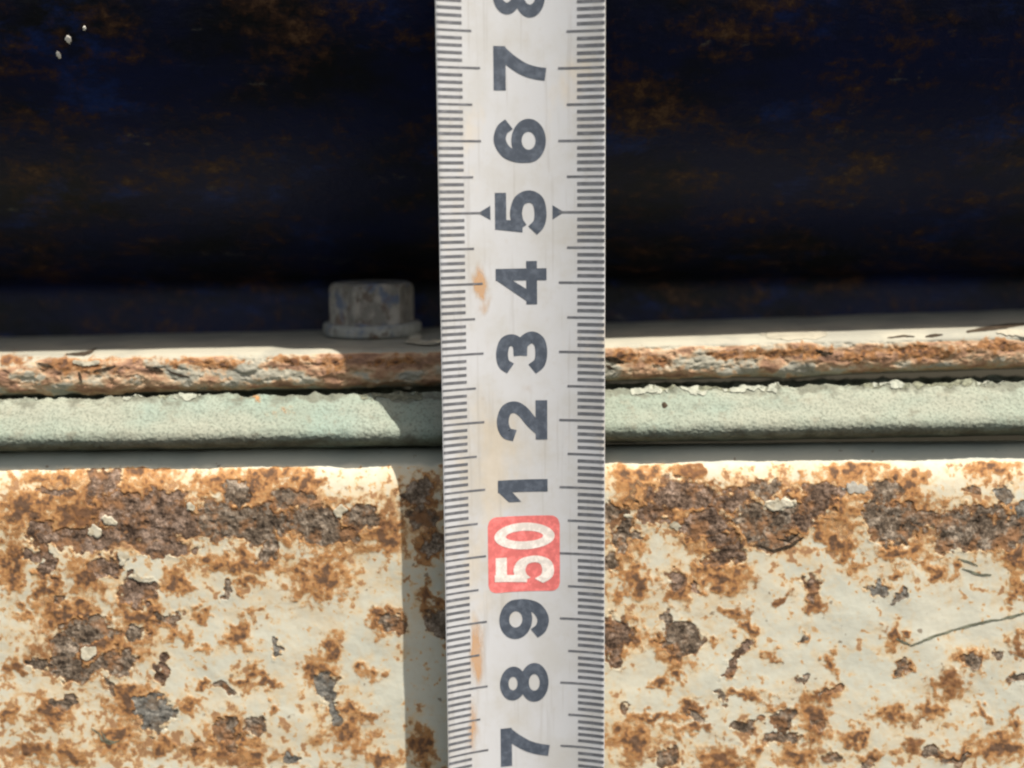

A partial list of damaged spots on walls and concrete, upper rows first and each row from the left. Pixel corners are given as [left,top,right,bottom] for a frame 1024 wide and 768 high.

corrosion [42,356,117,376]
corrosion [150,356,245,370]
corrosion [613,348,671,368]
corrosion [707,337,1024,364]
peeling [605,475,1024,570]
peeling [20,468,380,713]
corrosion [0,466,445,768]
peeling [656,609,708,662]
corrosion [605,461,1024,768]
peeling [131,652,178,739]
peeling [714,639,754,708]
peeling [729,708,802,744]